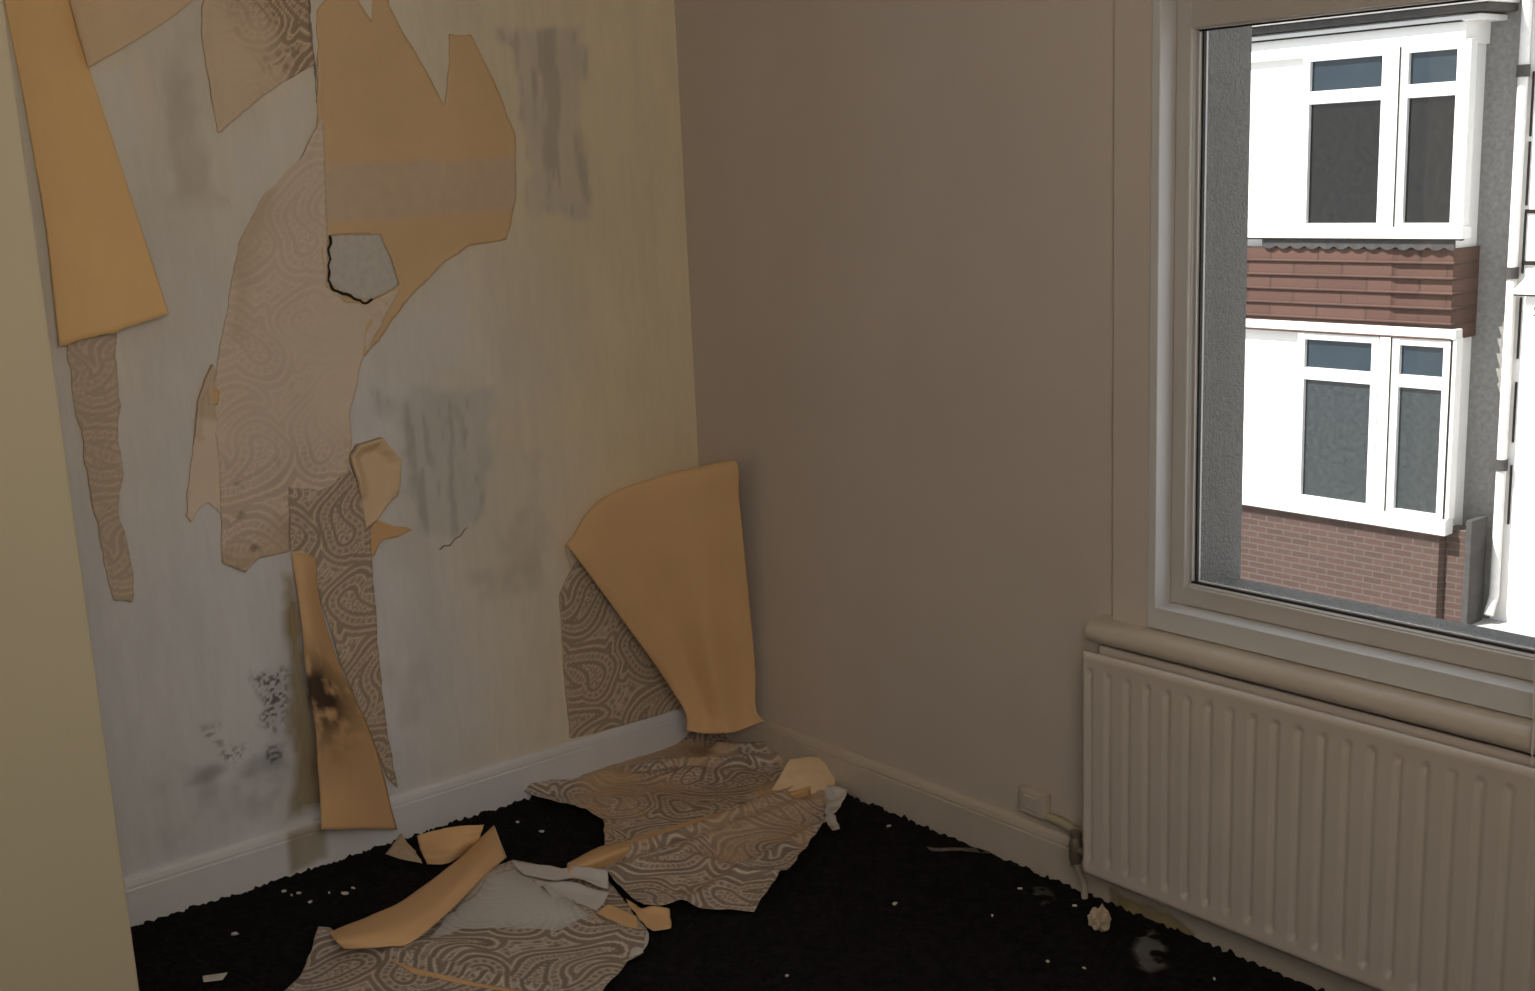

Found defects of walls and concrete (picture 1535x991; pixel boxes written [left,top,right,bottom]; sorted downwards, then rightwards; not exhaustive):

spalling [329,234,399,299]
peeling [186,364,221,522]
peeling [349,437,411,557]
damp [289,601,320,806]